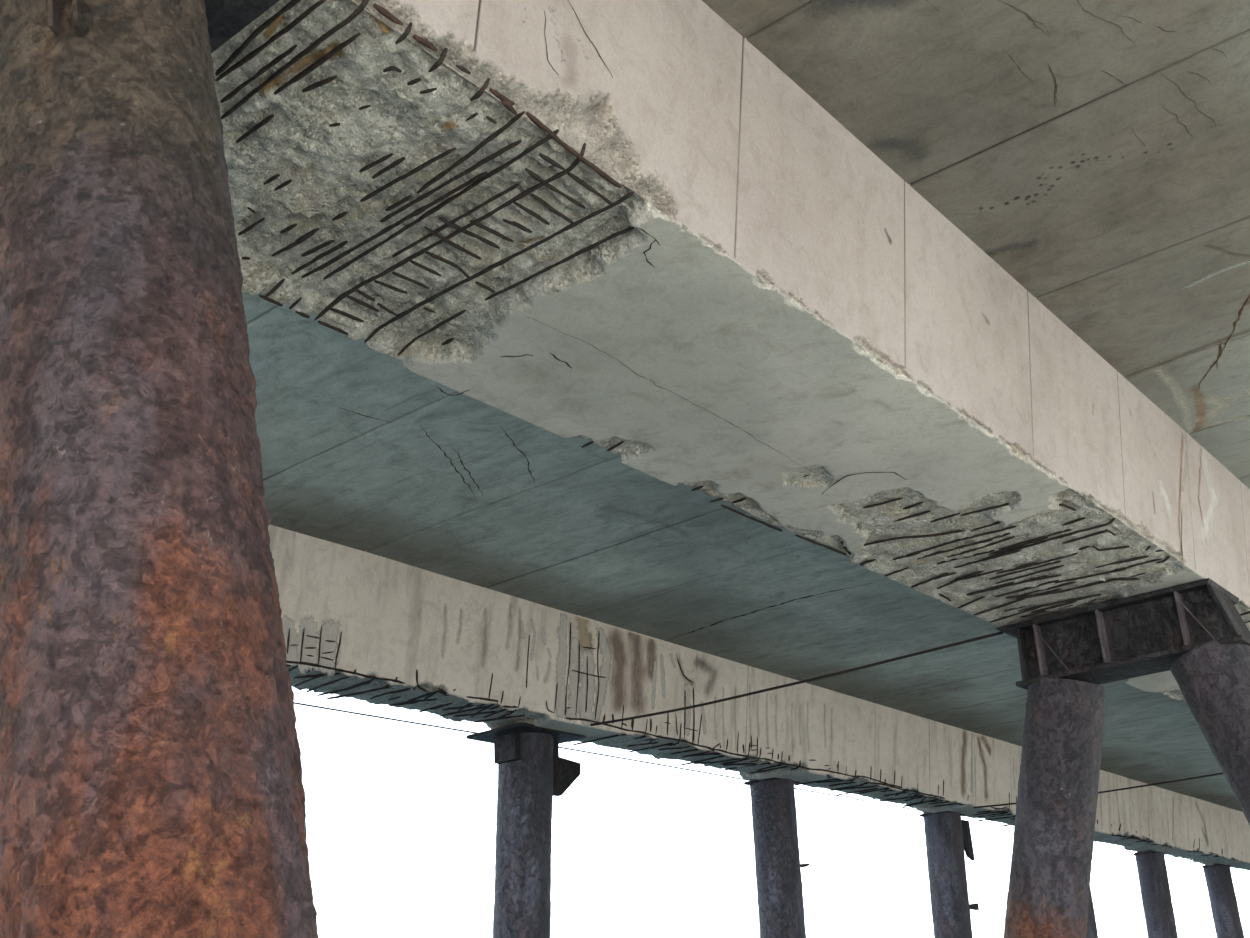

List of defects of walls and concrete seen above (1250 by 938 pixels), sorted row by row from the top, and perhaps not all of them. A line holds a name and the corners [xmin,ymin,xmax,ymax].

crack [544,1,613,77]
crack [999,0,1058,109]
crack [1161,48,1227,135]
spalling [211,0,741,371]
crack [1197,295,1250,391]
crack [426,433,483,496]
crack [500,426,534,479]
spalling [570,434,658,464]
spalling [672,265,1188,627]
spalling [1234,598,1250,631]
damp [612,632,655,711]
spalling [282,614,1017,826]